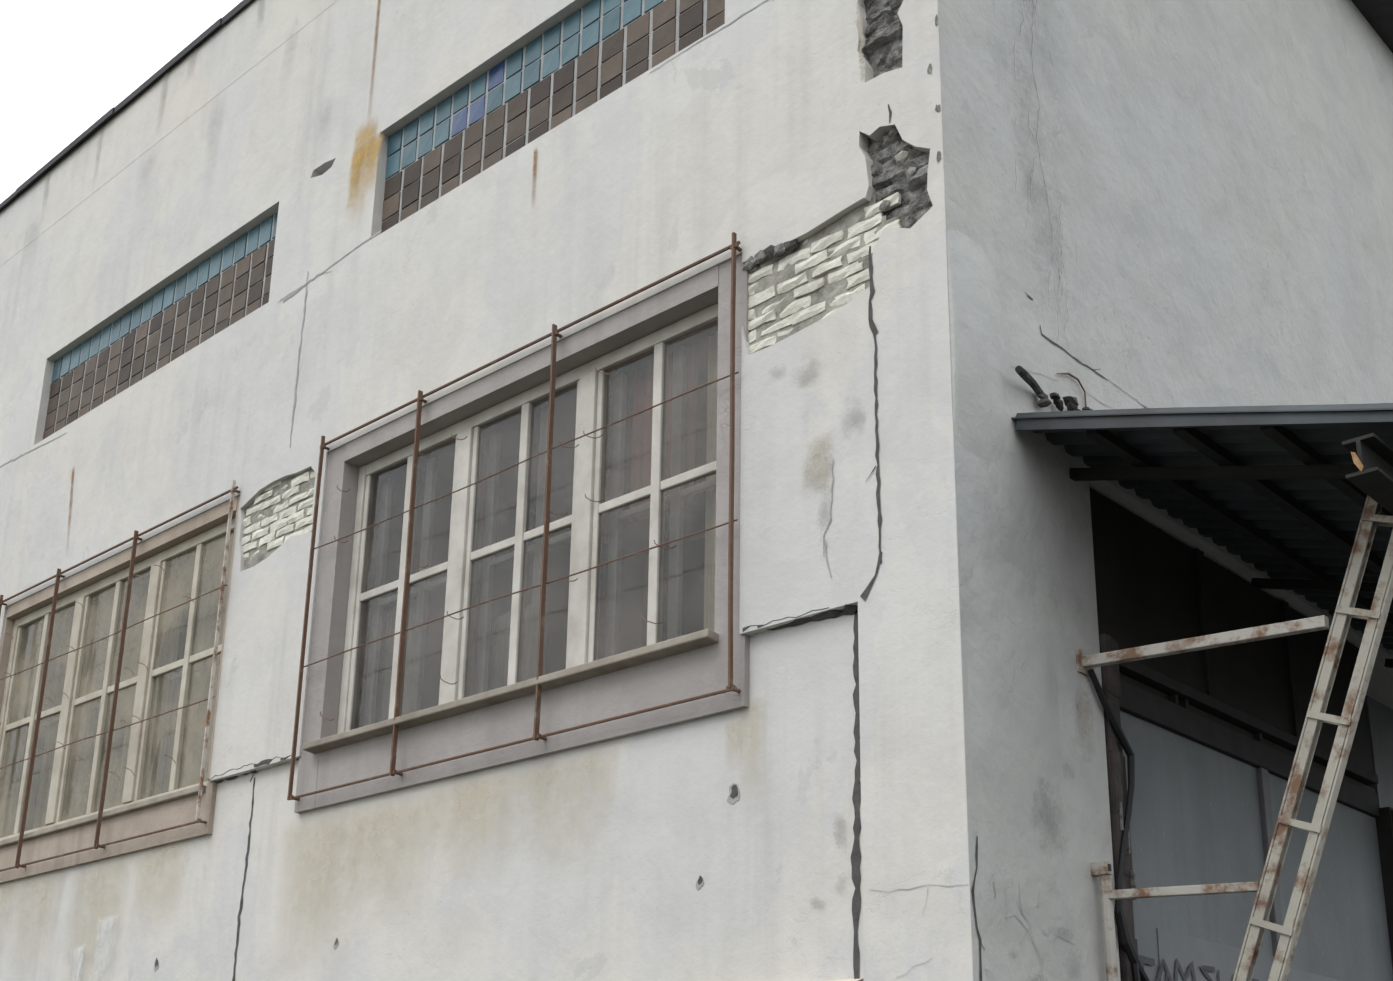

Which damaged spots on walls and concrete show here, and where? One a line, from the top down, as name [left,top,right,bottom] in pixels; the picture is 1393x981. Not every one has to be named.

spalling [857,0,903,78]
corrosion [352,128,381,179]
flaking render [742,126,941,354]
crack [1011,0,1147,409]
flaking render [241,469,316,570]
crack [823,246,882,601]
crack [232,777,255,981]
crack [875,836,1074,981]